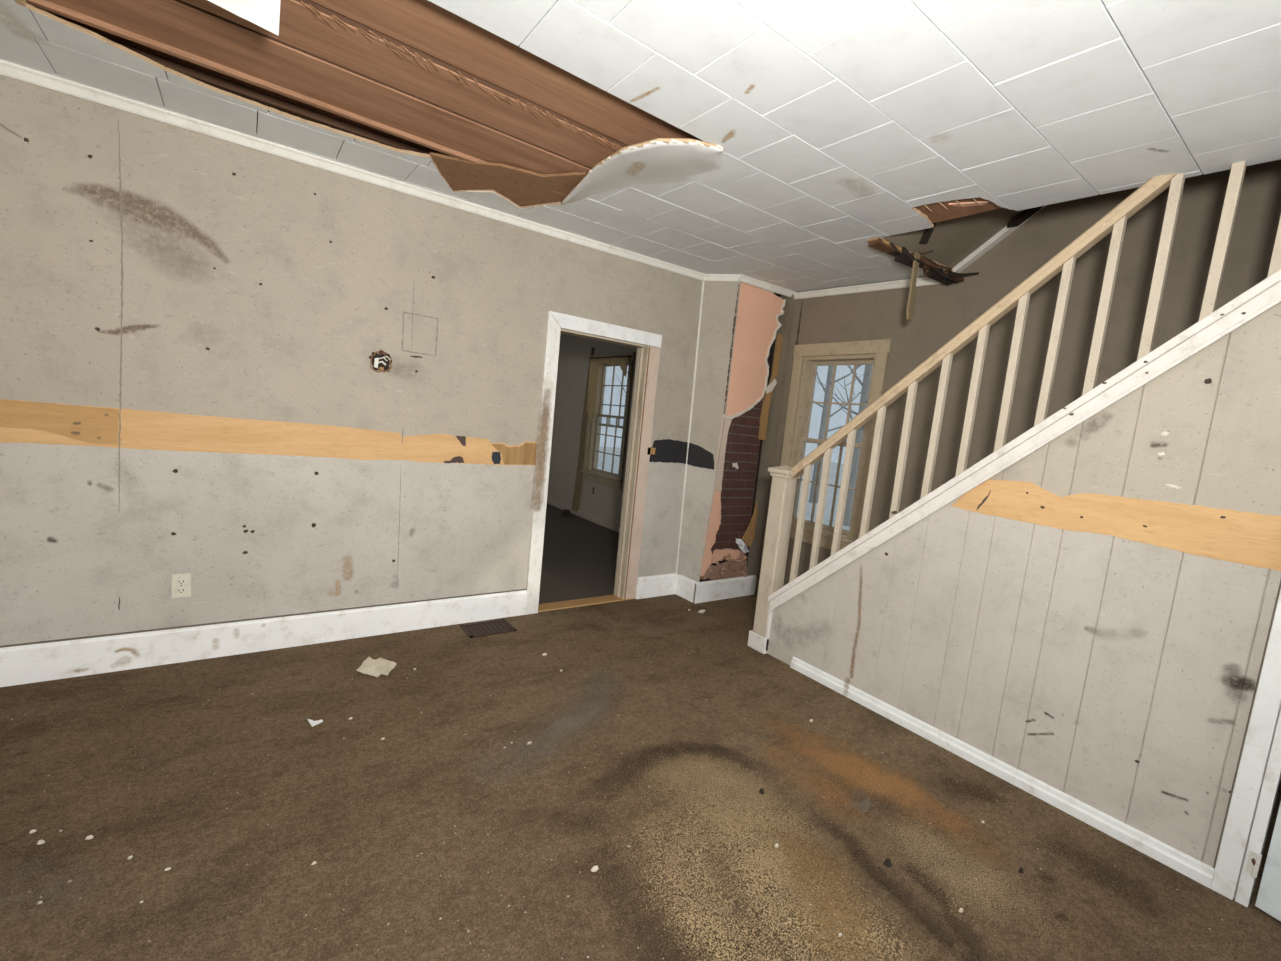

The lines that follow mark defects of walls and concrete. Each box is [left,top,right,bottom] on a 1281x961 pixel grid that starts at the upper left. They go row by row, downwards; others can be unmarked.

flaking render [711,299,786,556]